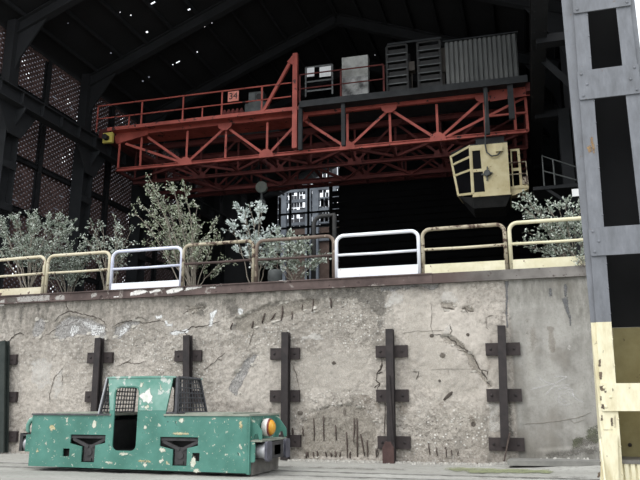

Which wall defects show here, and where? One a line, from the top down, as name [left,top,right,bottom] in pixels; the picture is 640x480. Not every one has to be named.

peeling [130,286,202,296]
leakage [562,284,571,325]
spalling [53,316,141,342]
crack [46,305,219,335]
crack [406,304,493,386]